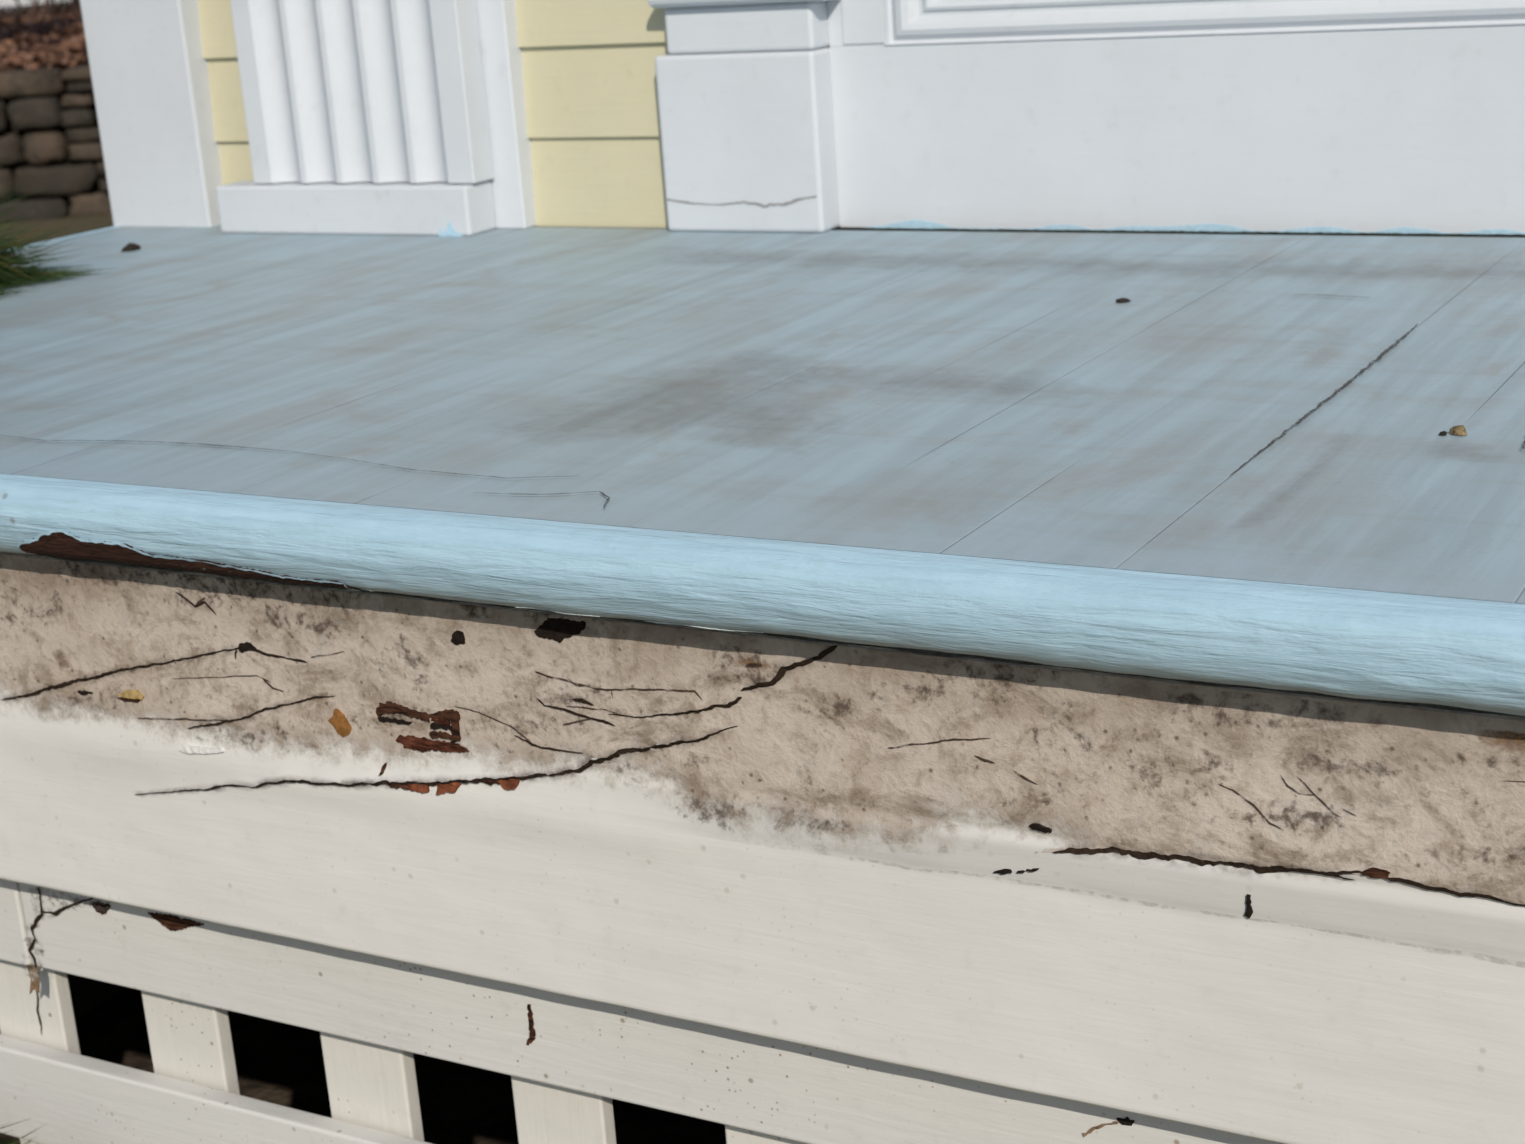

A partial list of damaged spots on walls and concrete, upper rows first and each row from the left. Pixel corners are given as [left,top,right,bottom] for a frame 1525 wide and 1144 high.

peeling [328,709,352,737]
crack [135,645,837,795]
leakage [0,553,1525,904]
peeling [378,762,409,790]
peeling [436,778,520,795]
crack [1219,784,1283,830]
crack [1281,776,1356,817]
peeling [1029,823,1052,833]
crack [1053,846,1525,906]
peeling [147,912,204,931]
spalling [1244,894,1253,919]
crack [25,887,107,1035]